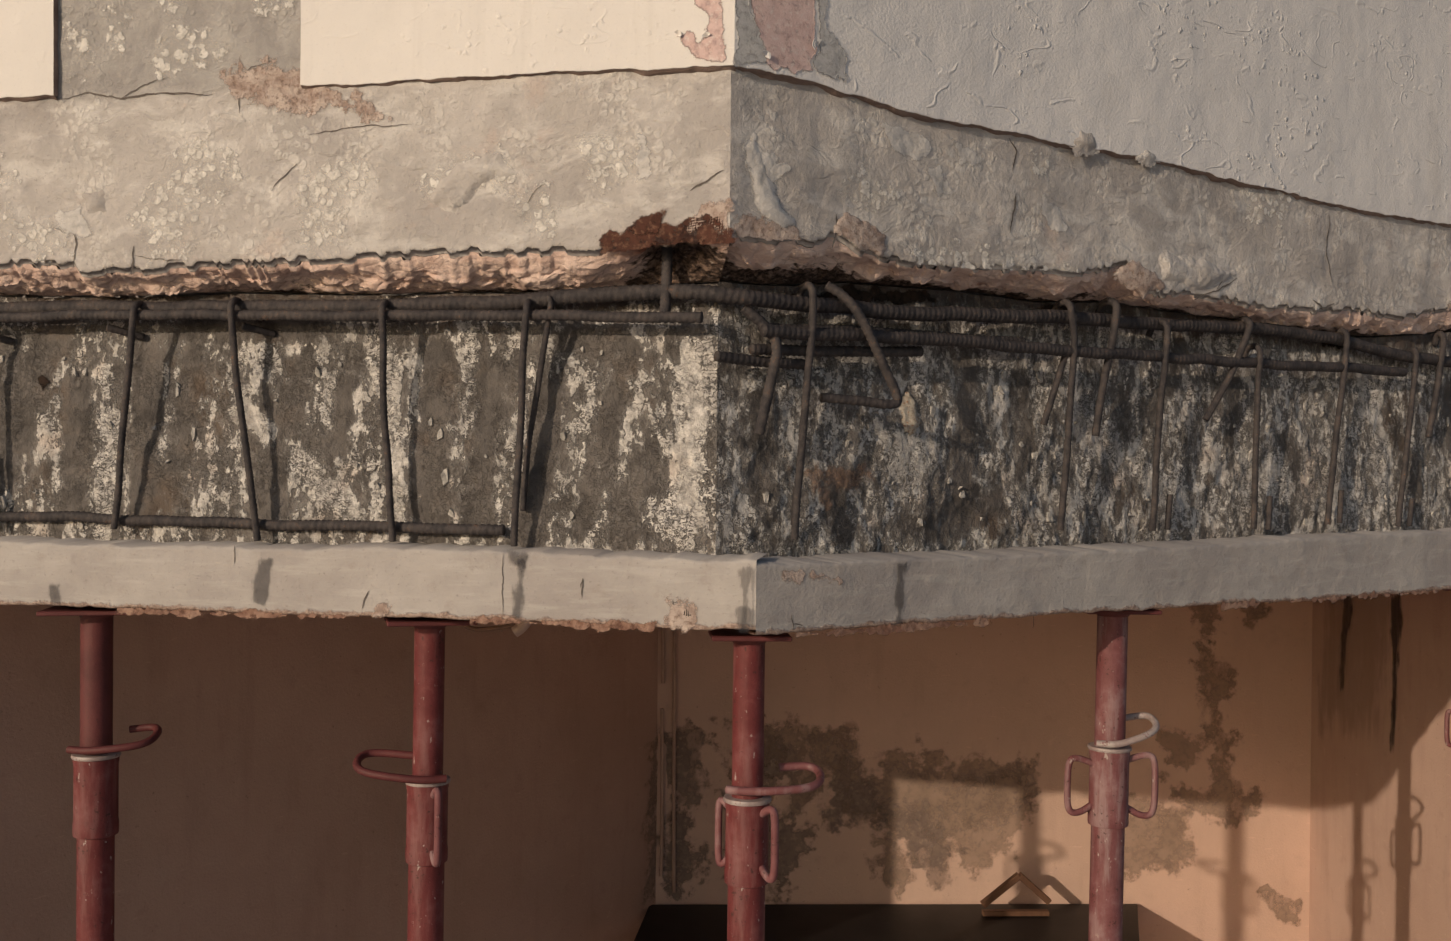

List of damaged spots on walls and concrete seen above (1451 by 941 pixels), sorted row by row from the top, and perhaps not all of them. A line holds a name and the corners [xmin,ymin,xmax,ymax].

peeling [674,0,848,82]
corrosion [599,210,735,256]
spalling [0,198,1451,557]
spalling [117,603,391,619]
spalling [470,598,697,633]
water stain [1240,602,1272,628]
water stain [1339,596,1352,690]
water stain [1390,594,1403,746]
water stain [1124,605,1262,880]
water stain [645,718,732,901]
water stain [763,714,1038,902]